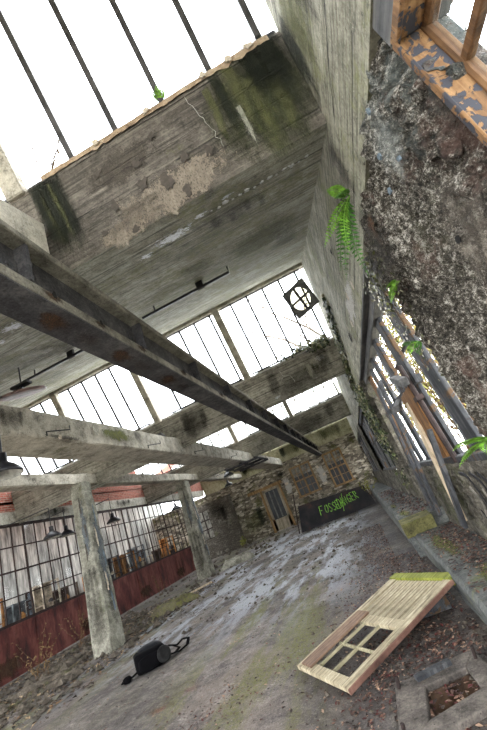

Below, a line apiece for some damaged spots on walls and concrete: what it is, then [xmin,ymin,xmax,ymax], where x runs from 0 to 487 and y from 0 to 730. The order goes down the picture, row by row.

damp [29,173,80,248]
peeling [88,131,243,249]
crack [88,68,285,202]
damp [202,0,316,159]
damp [93,425,129,441]